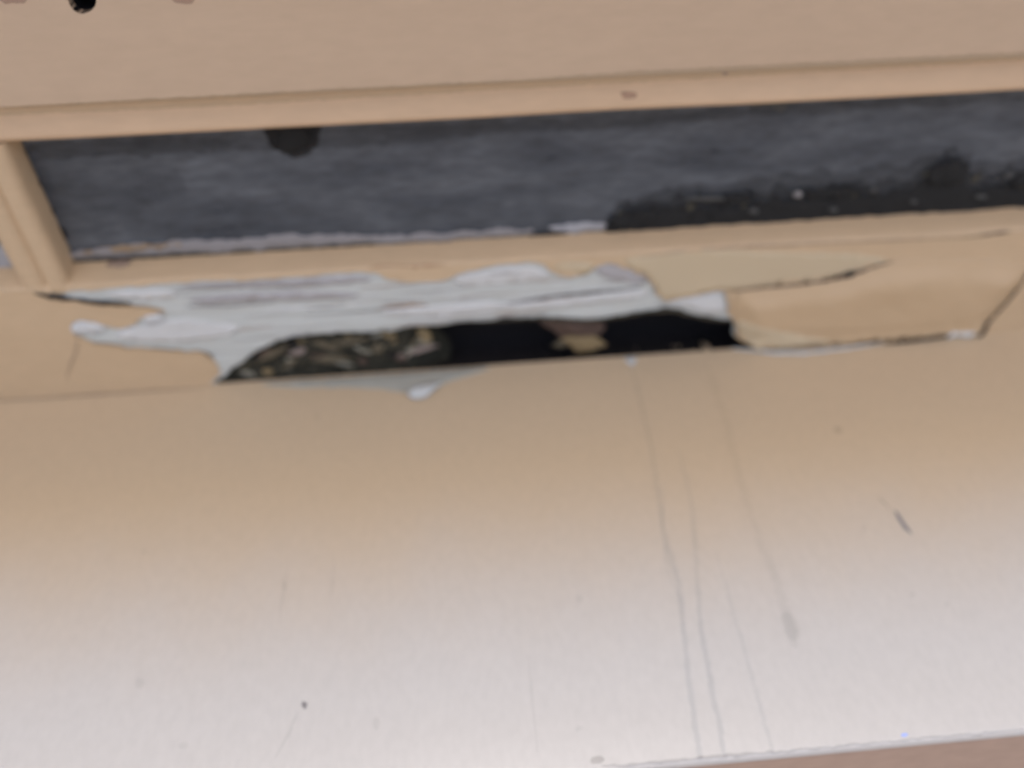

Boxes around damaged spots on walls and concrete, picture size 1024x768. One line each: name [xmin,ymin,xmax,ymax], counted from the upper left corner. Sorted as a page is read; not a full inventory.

peeling [50,250,886,384]
peeling [408,382,441,398]